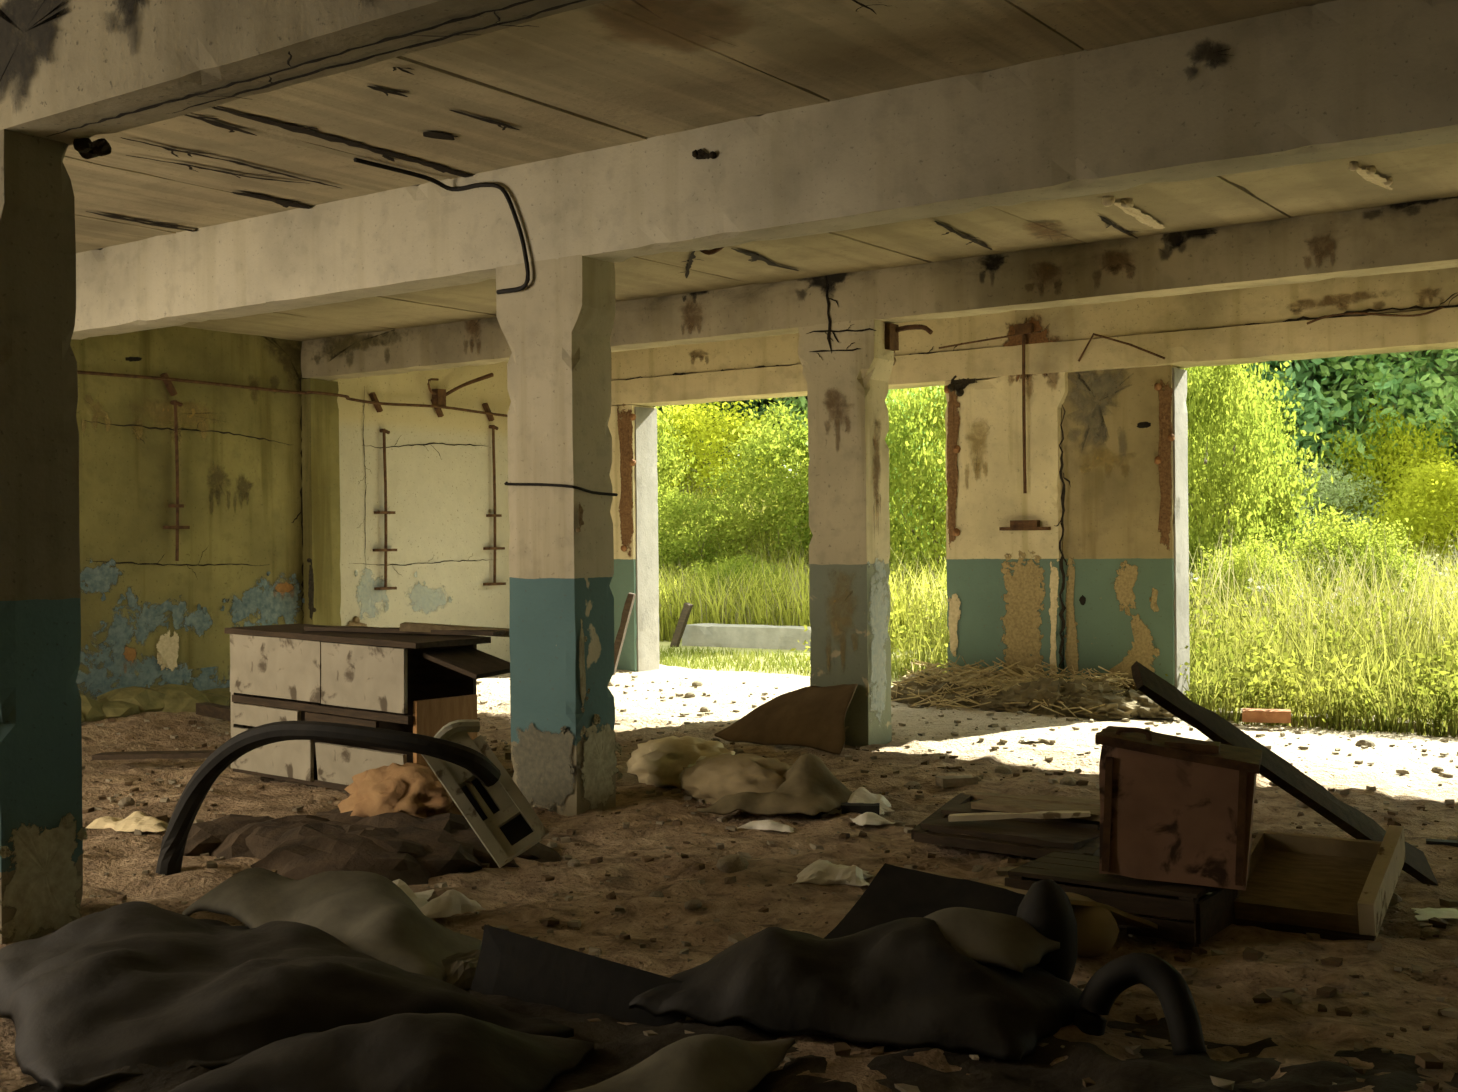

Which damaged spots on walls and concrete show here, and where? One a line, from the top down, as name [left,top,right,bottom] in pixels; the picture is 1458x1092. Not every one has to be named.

damp [0,0,65,96]
damp [117,0,145,30]
spalling [1102,196,1166,230]
spalling [1349,161,1393,190]
damp [804,272,852,290]
crack [1243,293,1458,326]
damp [208,466,252,497]
peeling [76,558,316,700]
peeling [1000,551,1086,680]
peeling [1109,560,1160,687]
peeling [512,619,623,812]
peeling [0,812,88,942]